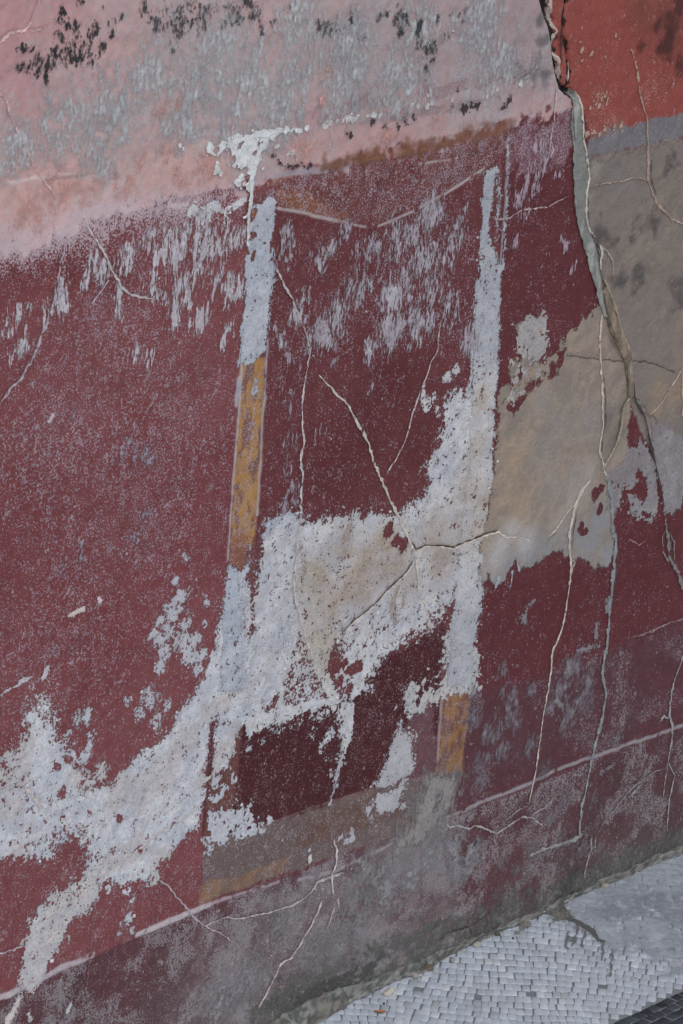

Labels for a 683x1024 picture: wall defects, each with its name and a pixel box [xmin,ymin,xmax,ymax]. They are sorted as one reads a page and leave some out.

crack [85,222,154,306]
water stain [0,0,564,792]
crack [274,0,683,878]
water stain [560,233,577,275]
flaking render [472,138,683,593]
flaking render [0,362,484,1024]
water stain [544,595,612,735]
crack [158,840,344,1007]
water stain [199,784,589,1024]